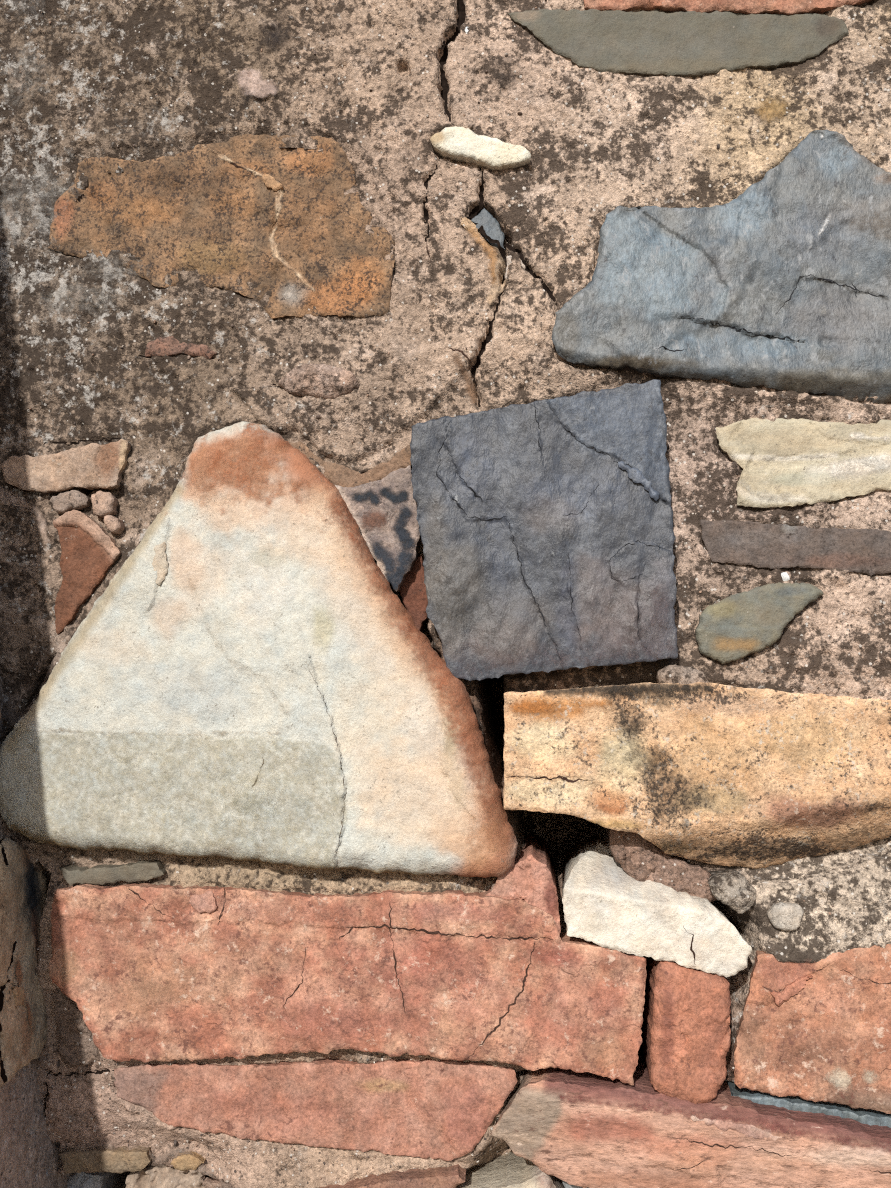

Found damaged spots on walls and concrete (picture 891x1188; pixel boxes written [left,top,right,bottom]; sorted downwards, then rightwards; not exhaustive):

crack [439,0,466,122]
crack [423,156,442,271]
crack [450,168,557,407]
crack [339,904,551,1058]